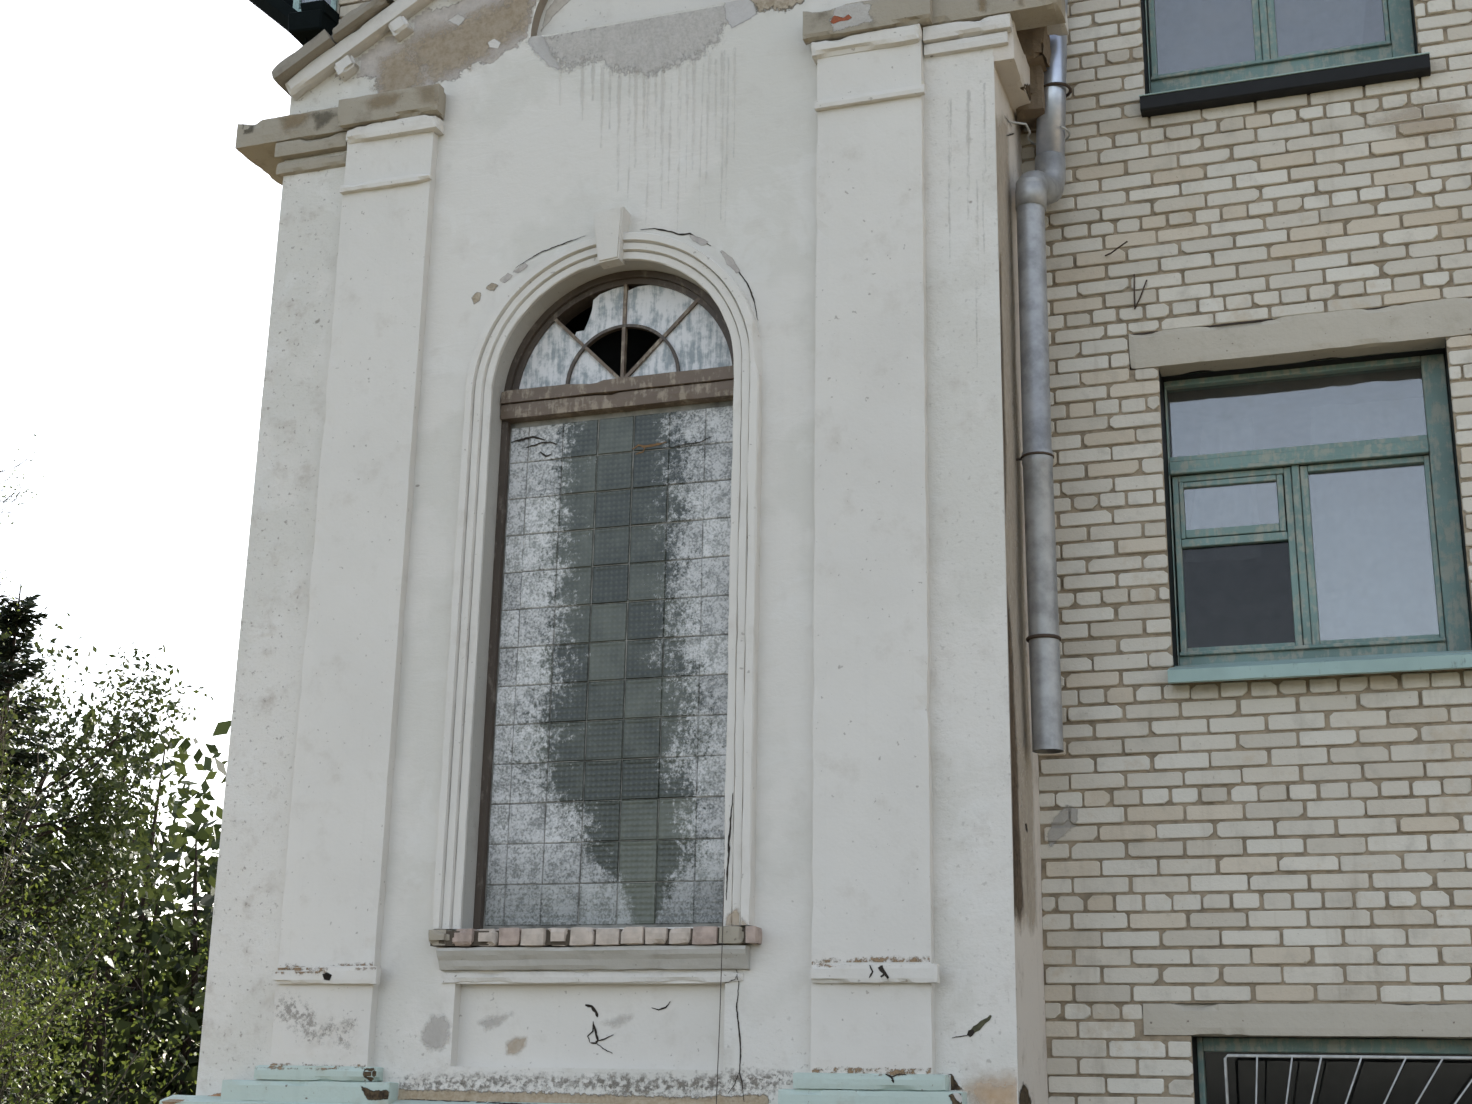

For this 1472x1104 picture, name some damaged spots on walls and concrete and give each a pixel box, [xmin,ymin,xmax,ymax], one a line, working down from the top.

flaking render [335,0,570,93]
flaking render [751,0,804,12]
leakage [996,123,1035,922]
crack [726,970,744,1100]
crack [383,1096,522,1104]